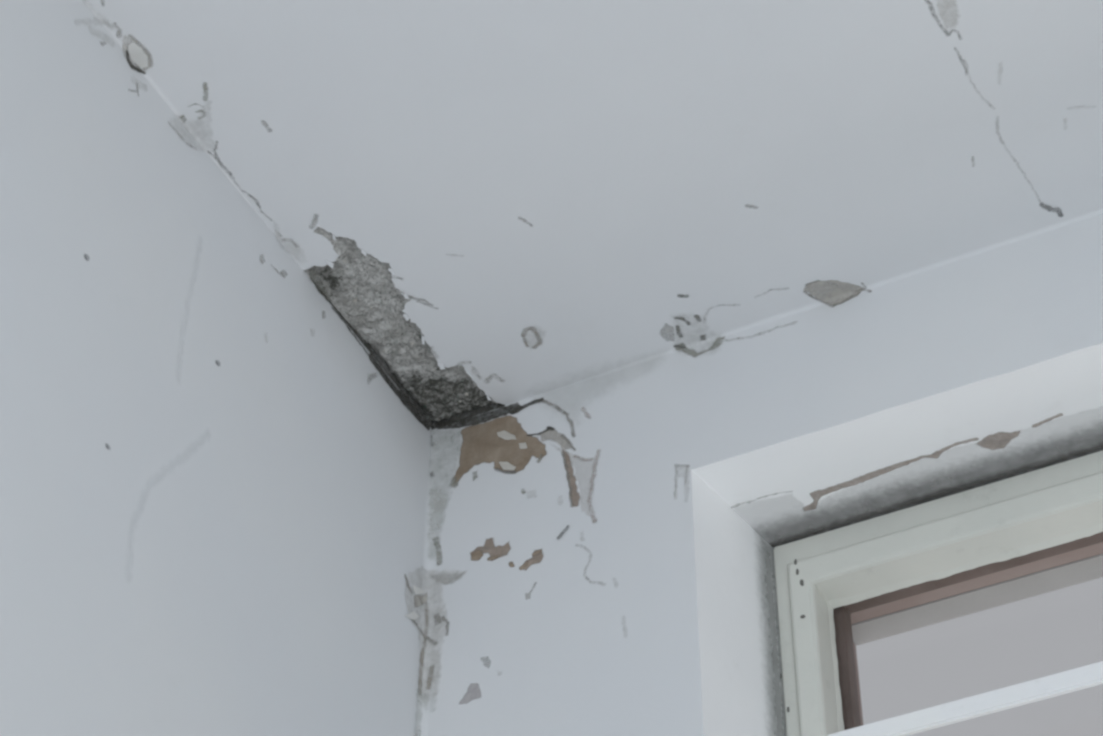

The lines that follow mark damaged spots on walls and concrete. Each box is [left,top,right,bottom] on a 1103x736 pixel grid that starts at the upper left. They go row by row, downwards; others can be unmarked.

crack [1040,203,1063,217]
peeling [804,280,871,306]
peeling [661,315,724,357]
spalling [304,215,600,522]
peeling [803,431,1020,511]
leakage [767,433,1103,547]
peeling [471,538,543,570]
peeling [460,684,481,704]